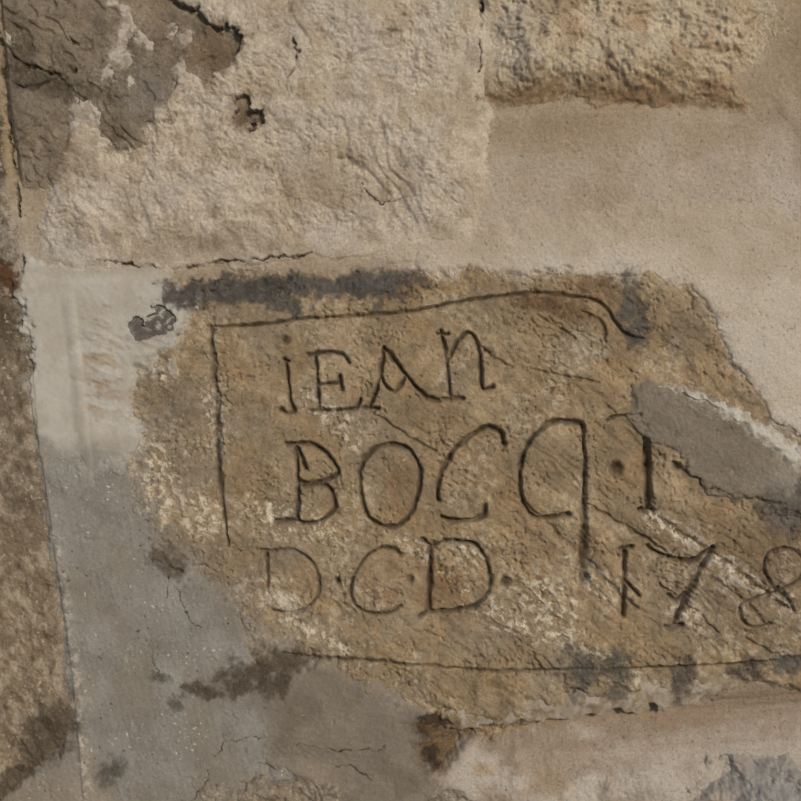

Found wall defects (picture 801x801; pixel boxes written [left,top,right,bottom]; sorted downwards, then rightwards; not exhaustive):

spalling [234,95,264,133]
crack [9,123,22,217]
flaking render [128,305,180,341]